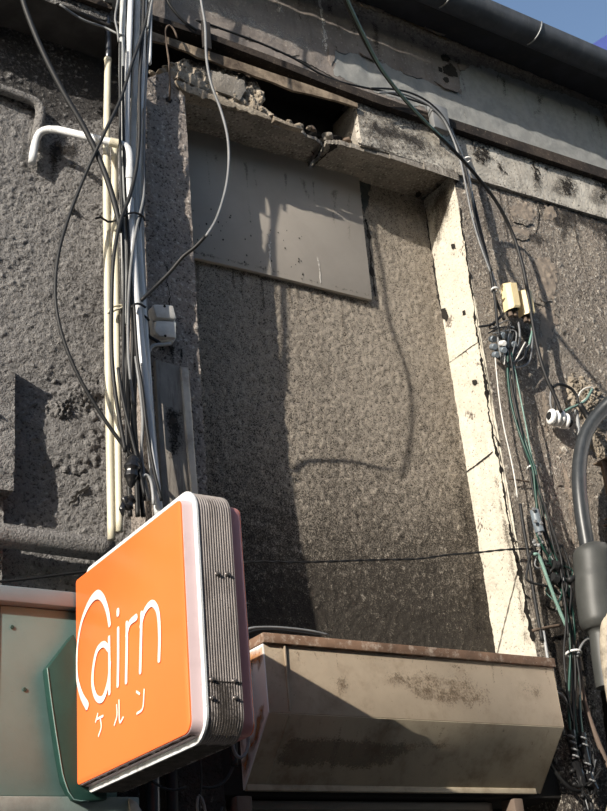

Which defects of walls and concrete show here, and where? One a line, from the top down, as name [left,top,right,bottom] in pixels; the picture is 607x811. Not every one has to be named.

spalling [116,18,351,159]
water stain [471,140,508,174]
water stain [556,177,577,197]
crack [364,218,376,297]
crack [425,209,441,307]
crack [450,208,535,642]